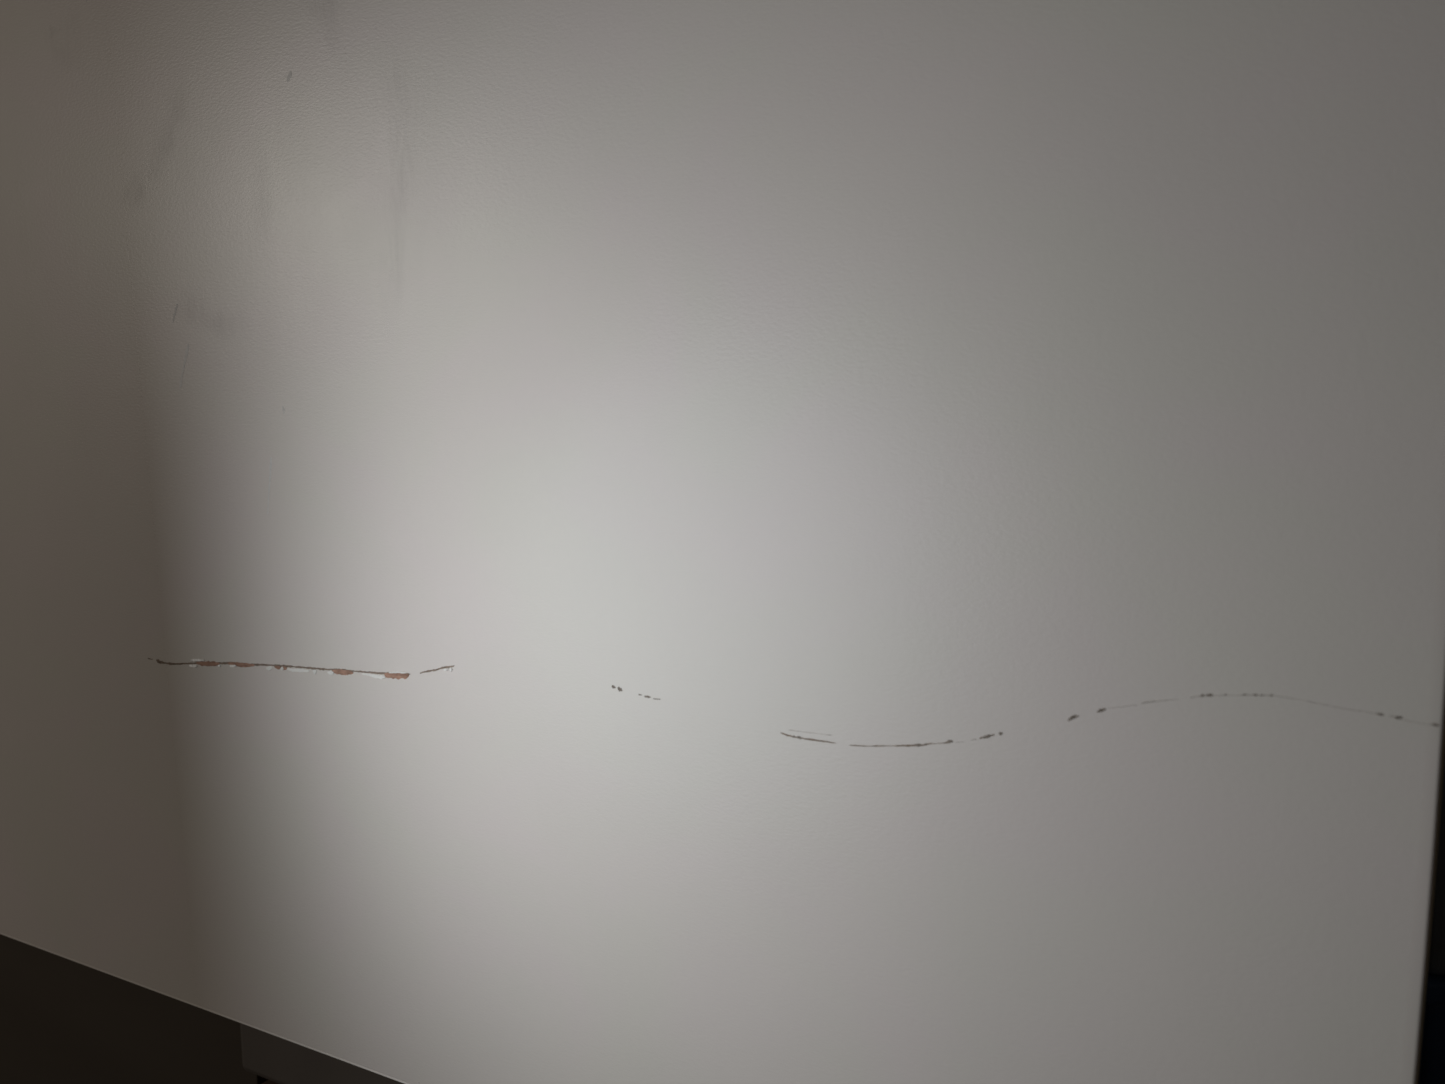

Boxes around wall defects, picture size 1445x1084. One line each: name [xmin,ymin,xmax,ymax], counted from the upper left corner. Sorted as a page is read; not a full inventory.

crack [148,658,455,680]
crack [1068,694,1441,727]
crack [781,730,1003,747]